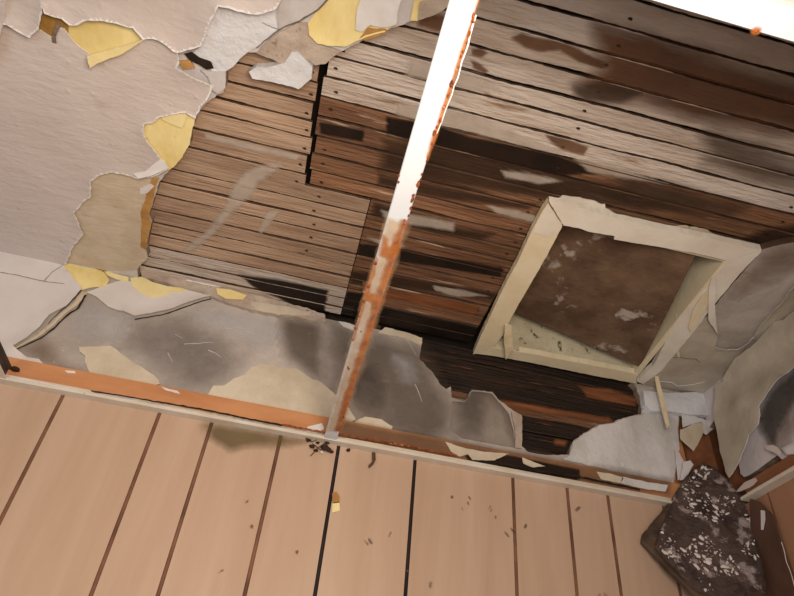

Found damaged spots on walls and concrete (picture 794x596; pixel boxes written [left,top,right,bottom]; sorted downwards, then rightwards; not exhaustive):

damp [419,16,444,31]
corrosion [426,12,477,162]
damp [513,28,794,127]
flaking render [0,0,449,363]
damp [379,117,414,187]
damp [417,127,733,210]
flaking render [377,0,794,468]
corrosion [91,173,457,456]
peeling [79,346,180,394]
peeling [208,364,336,433]
corrosion [498,461,640,491]
flaking render [674,417,718,484]